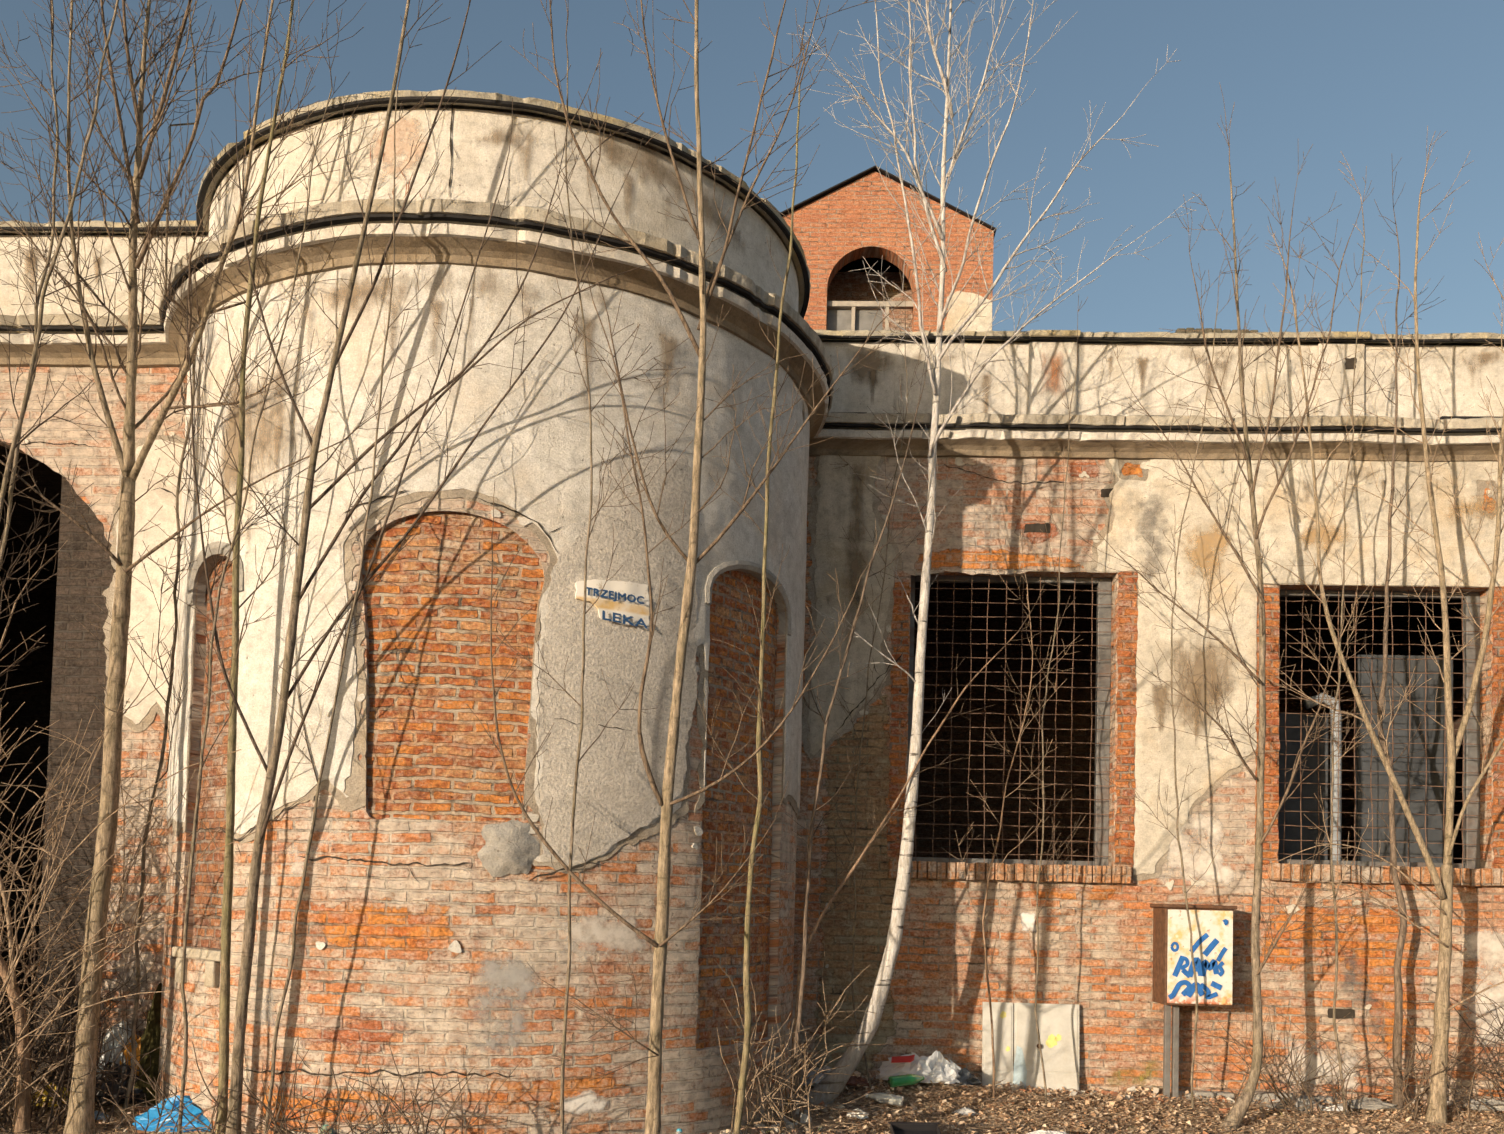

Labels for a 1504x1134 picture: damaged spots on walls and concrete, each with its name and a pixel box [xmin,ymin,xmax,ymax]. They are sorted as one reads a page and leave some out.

leakage [662,337,677,386]
leakage [222,373,283,496]
flaking render [876,457,1150,575]
leakage [1154,647,1227,734]
flaking render [520,720,542,840]
flaking render [676,656,703,902]
crack [298,856,469,881]
flaking render [309,893,463,964]
spalling [300,1008,430,1055]
flaking render [259,1085,441,1133]
flaking render [485,1066,632,1123]